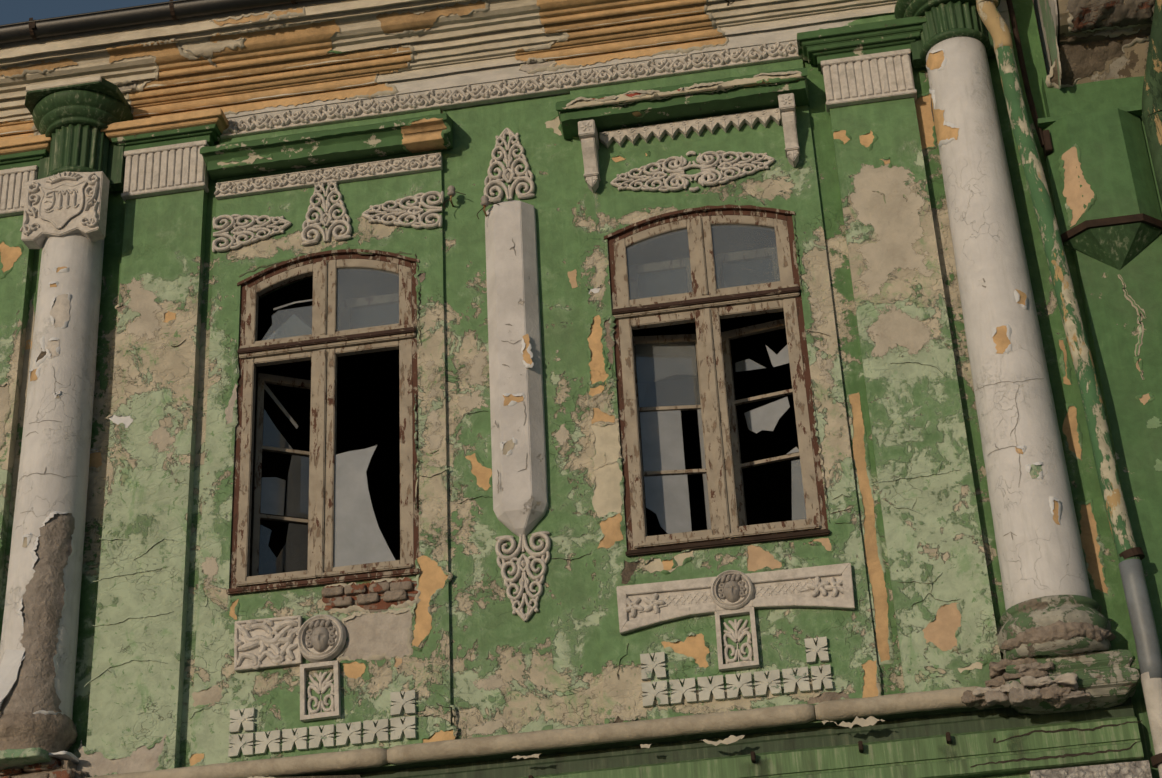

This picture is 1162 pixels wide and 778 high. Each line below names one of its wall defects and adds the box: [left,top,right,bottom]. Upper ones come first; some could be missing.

peeling [106,0,490,120]
peeling [515,0,729,74]
peeling [831,129,935,359]
peeling [1058,144,1097,228]
peeling [587,315,695,584]
spalling [0,511,75,715]
crack [84,658,168,687]
crack [93,537,177,582]
crack [92,591,225,627]
spalling [321,556,454,683]
peeling [806,392,895,704]
spalling [923,601,1091,709]